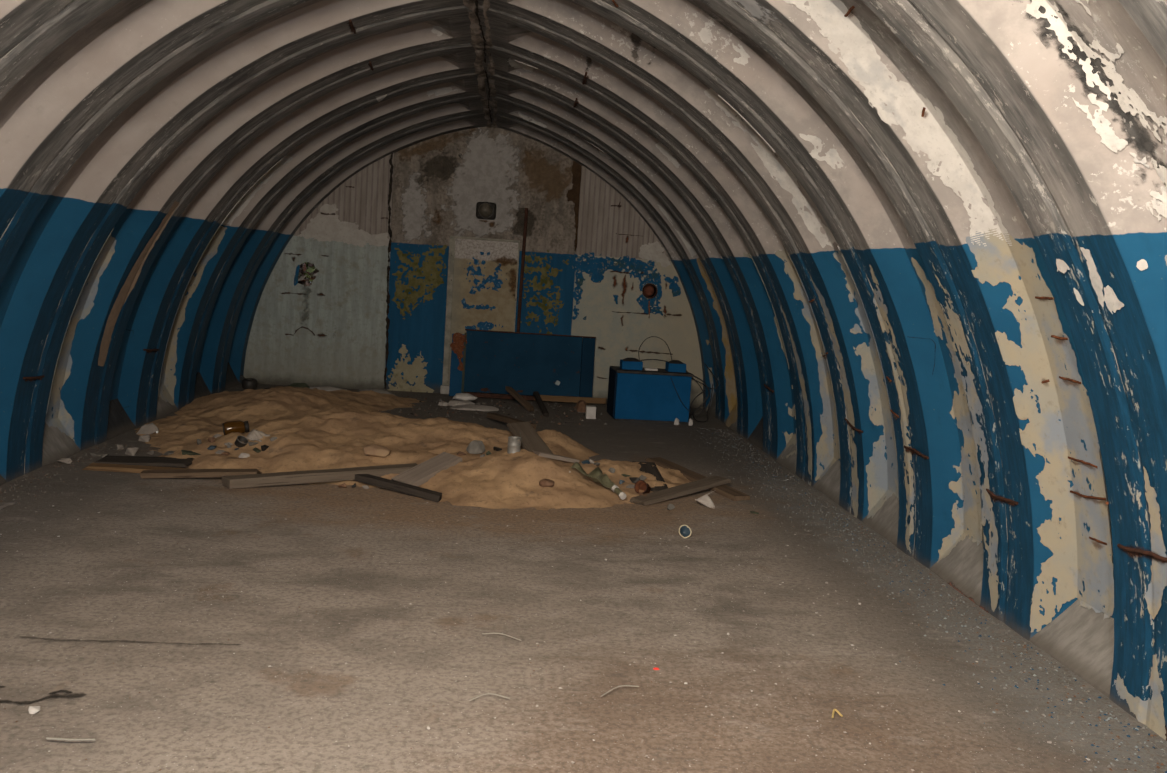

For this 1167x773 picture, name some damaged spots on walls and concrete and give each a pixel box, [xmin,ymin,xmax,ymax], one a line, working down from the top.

crack [475,0,492,122]
peeling [698,24,713,44]
peeling [732,43,750,66]
water stain [392,127,536,319]
peeling [386,344,434,393]
peeling [461,252,507,333]
peeling [657,204,737,427]
peeling [704,88,929,553]
peeling [784,0,1167,632]
peeling [1112,638,1166,740]